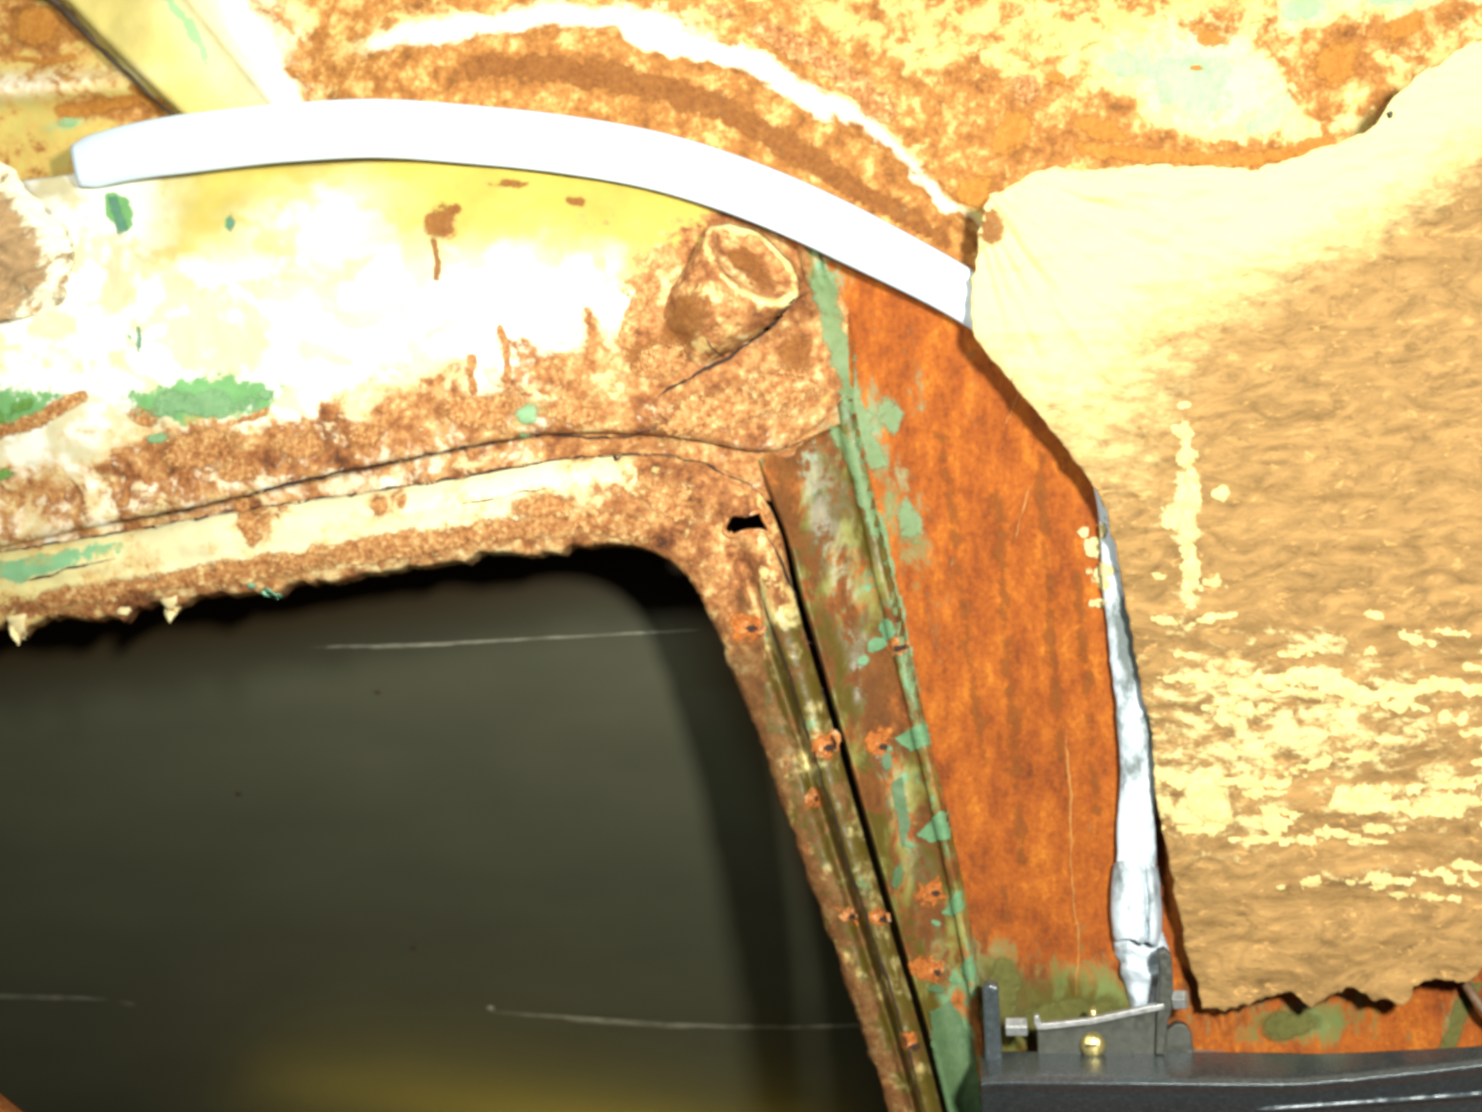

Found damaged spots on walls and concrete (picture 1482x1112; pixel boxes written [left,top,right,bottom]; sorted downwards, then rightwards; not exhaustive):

rust [463,53,950,249]
peeling [1096,38,1295,135]
rust [1074,114,1332,166]
rust [424,204,462,281]
rust [618,276,710,380]
rust [0,390,88,439]
rust [651,333,824,448]
rust [36,406,712,616]
peeling [809,268,922,695]
peeling [882,722,951,889]
peeling [931,890,965,926]
peeling [927,954,981,1112]